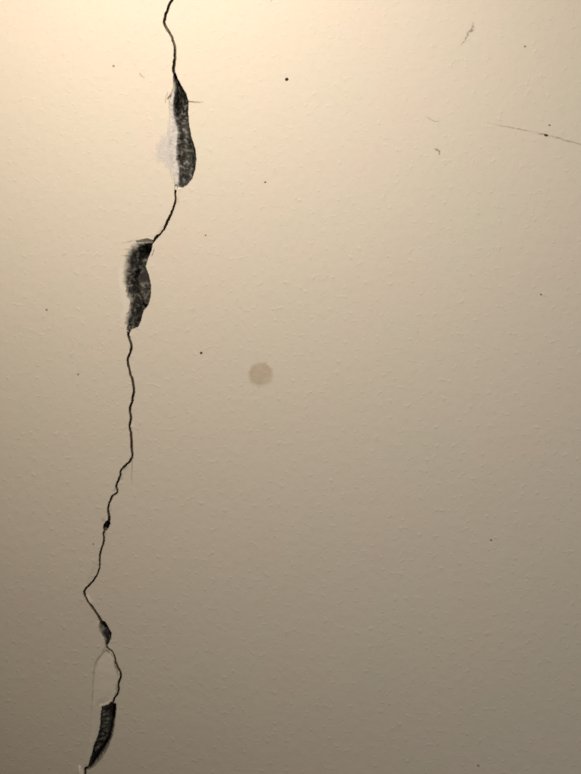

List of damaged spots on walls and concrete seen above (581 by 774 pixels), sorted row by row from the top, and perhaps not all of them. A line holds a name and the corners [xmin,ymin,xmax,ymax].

crack [163,0,177,75]
spalling [158,72,197,190]
crack [151,184,178,243]
spalling [117,238,154,333]
crack [83,324,135,622]
spalling [84,621,119,770]
crack [106,645,122,704]
crack [78,766,90,774]